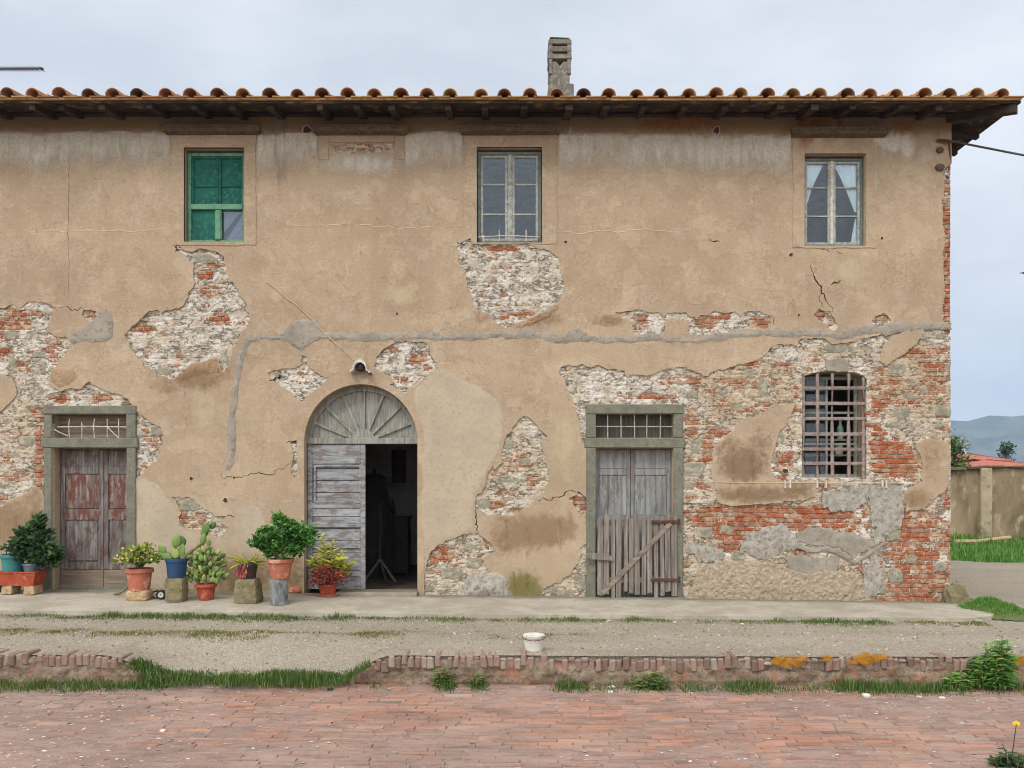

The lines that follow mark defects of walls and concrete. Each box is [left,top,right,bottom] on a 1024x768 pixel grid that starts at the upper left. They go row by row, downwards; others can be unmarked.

spalling [125,248,251,379]
spalling [457,240,564,328]
crack [811,249,842,312]
spalling [0,301,164,507]
spalling [268,355,328,401]
spalling [374,341,436,395]
spalling [559,165,951,602]
spalling [475,416,549,516]
spalling [172,497,230,537]
spalling [424,532,507,595]
spalling [539,544,586,597]